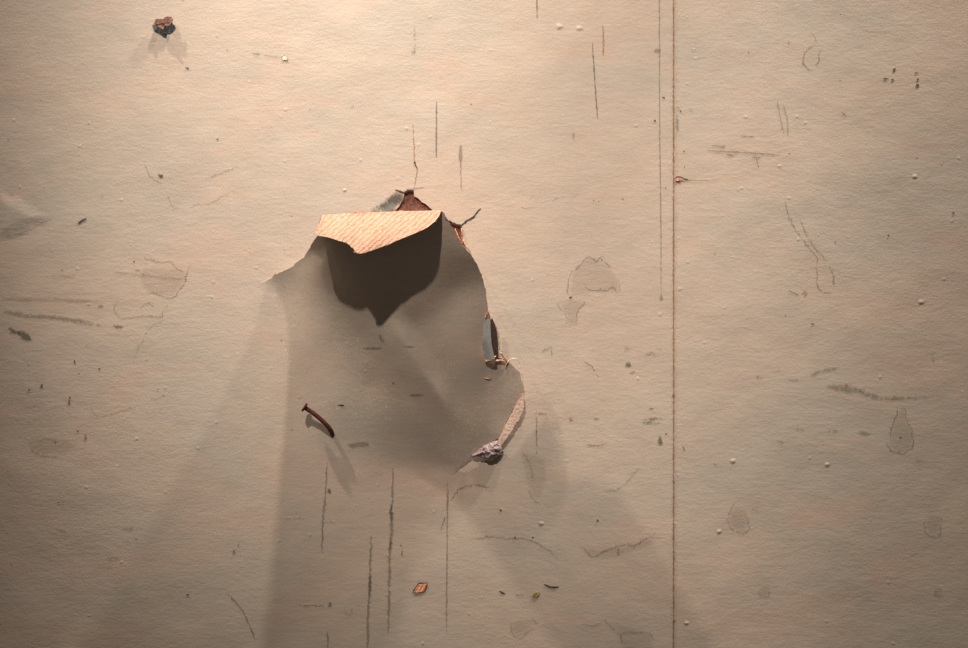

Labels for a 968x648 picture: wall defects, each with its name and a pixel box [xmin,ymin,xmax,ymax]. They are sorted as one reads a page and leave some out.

spalling [374,194,404,211]
crack [445,208,481,232]